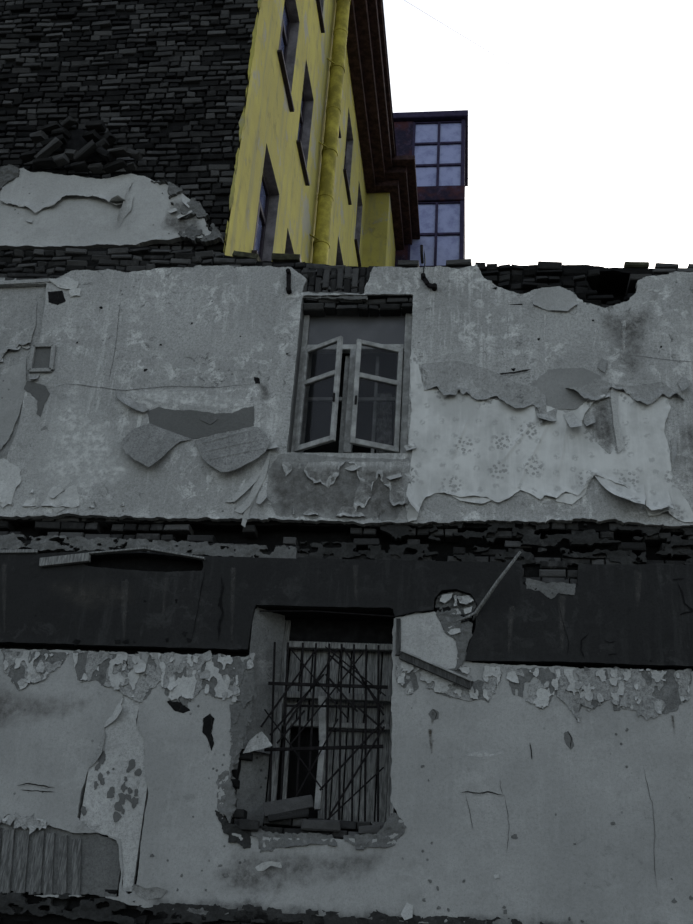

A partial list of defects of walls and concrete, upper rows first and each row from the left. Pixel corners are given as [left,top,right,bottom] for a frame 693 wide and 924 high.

spalling [0,164,20,190]
peeling [168,194,192,219]
spalling [48,277,81,305]
spalling [475,261,635,308]
peeling [0,301,37,508]
spalling [0,389,693,599]
spalling [395,592,692,722]
spalling [1,648,406,871]
crack [461,786,509,848]